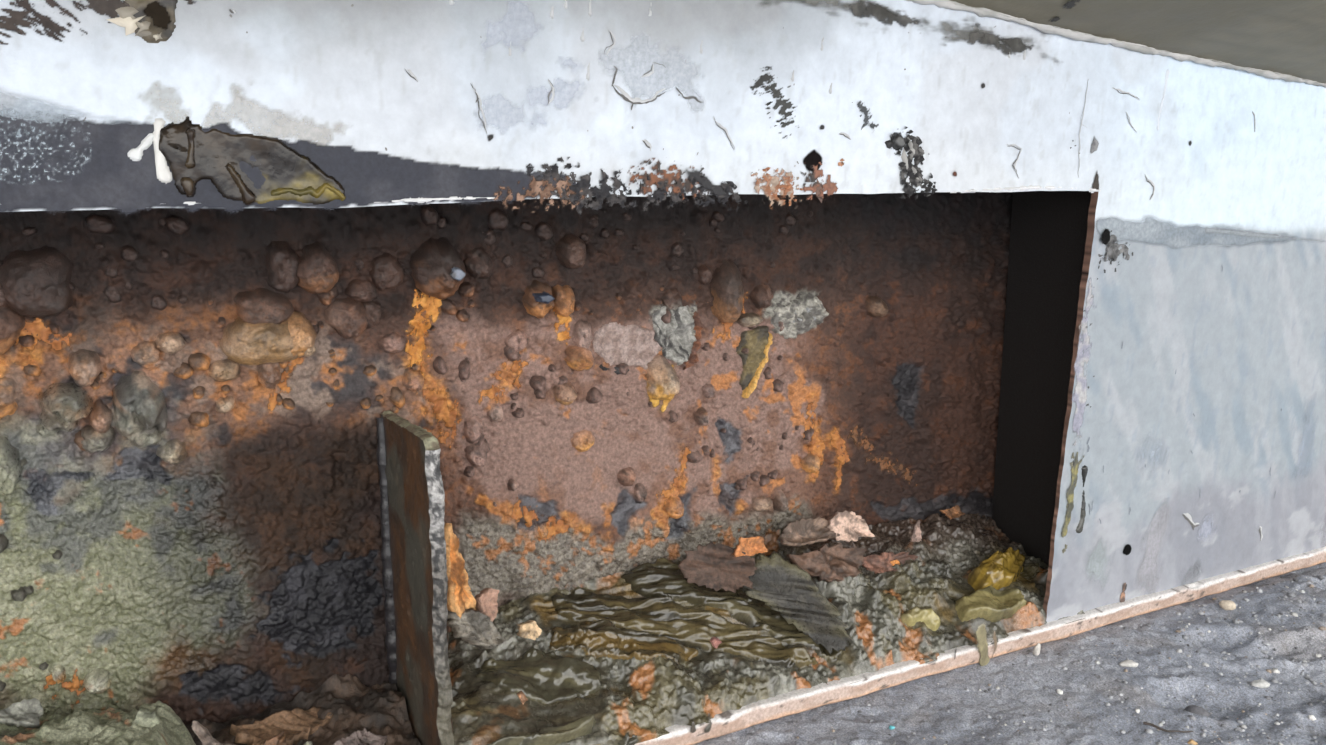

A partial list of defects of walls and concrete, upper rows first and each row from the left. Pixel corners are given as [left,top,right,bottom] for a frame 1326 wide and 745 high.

rust [0,157,829,496]
rust [0,534,9,553]
rust [507,478,570,542]
rust [617,445,715,519]
rust [678,470,922,593]
rust [779,402,917,491]
rust [939,505,965,520]
rust [475,588,499,622]